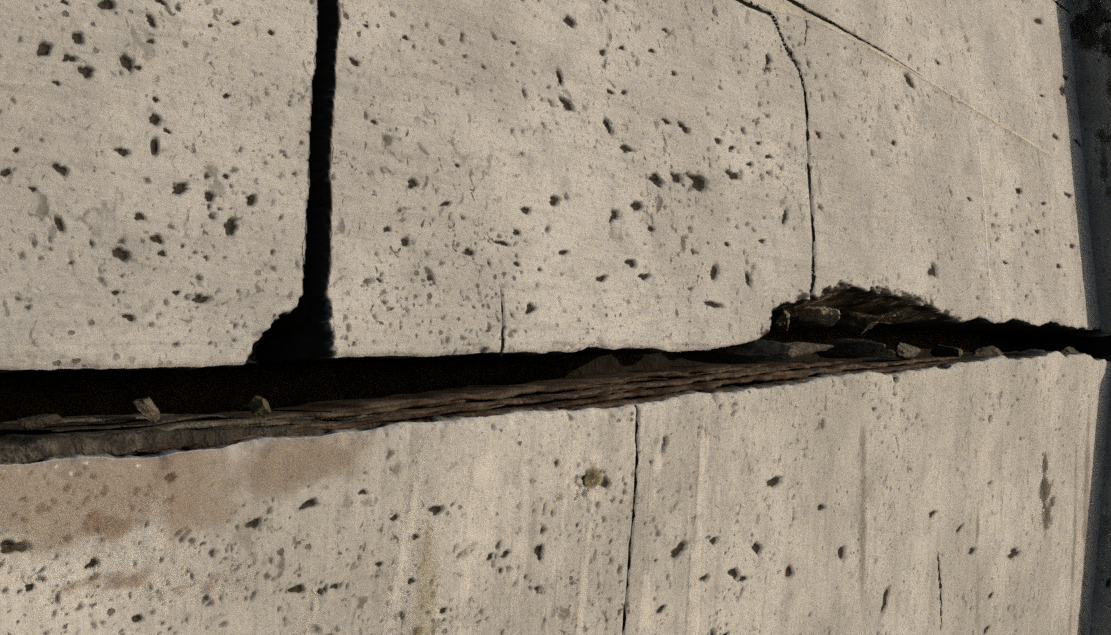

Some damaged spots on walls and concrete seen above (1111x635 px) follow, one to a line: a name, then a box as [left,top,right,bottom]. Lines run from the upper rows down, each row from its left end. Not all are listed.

crack [1053,0,1111,22]
crack [239,117,334,373]
crack [736,0,915,293]
spalling [786,292,938,324]
crack [622,405,639,633]